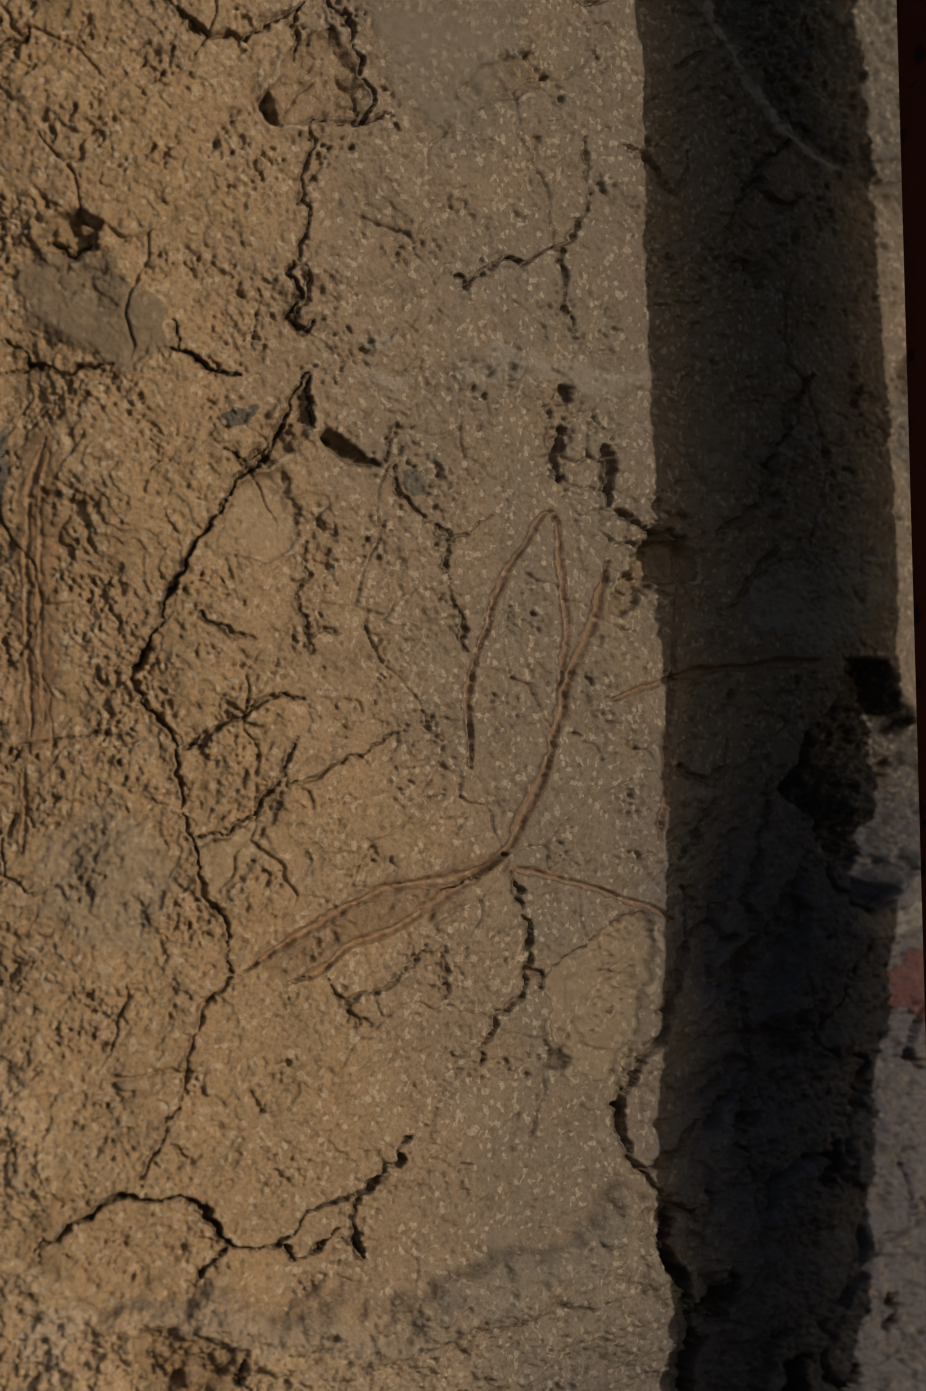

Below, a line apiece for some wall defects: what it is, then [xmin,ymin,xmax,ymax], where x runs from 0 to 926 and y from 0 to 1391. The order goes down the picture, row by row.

crack [0,31,31,53]
crack [163,0,400,336]
crack [36,240,93,259]
crack [3,338,114,377]
crack [166,319,241,377]
crack [382,422,493,652]
crack [12,729,109,762]
spalling [776,659,921,905]
crack [34,372,412,1282]
crack [291,950,452,1026]
crack [479,870,545,1067]